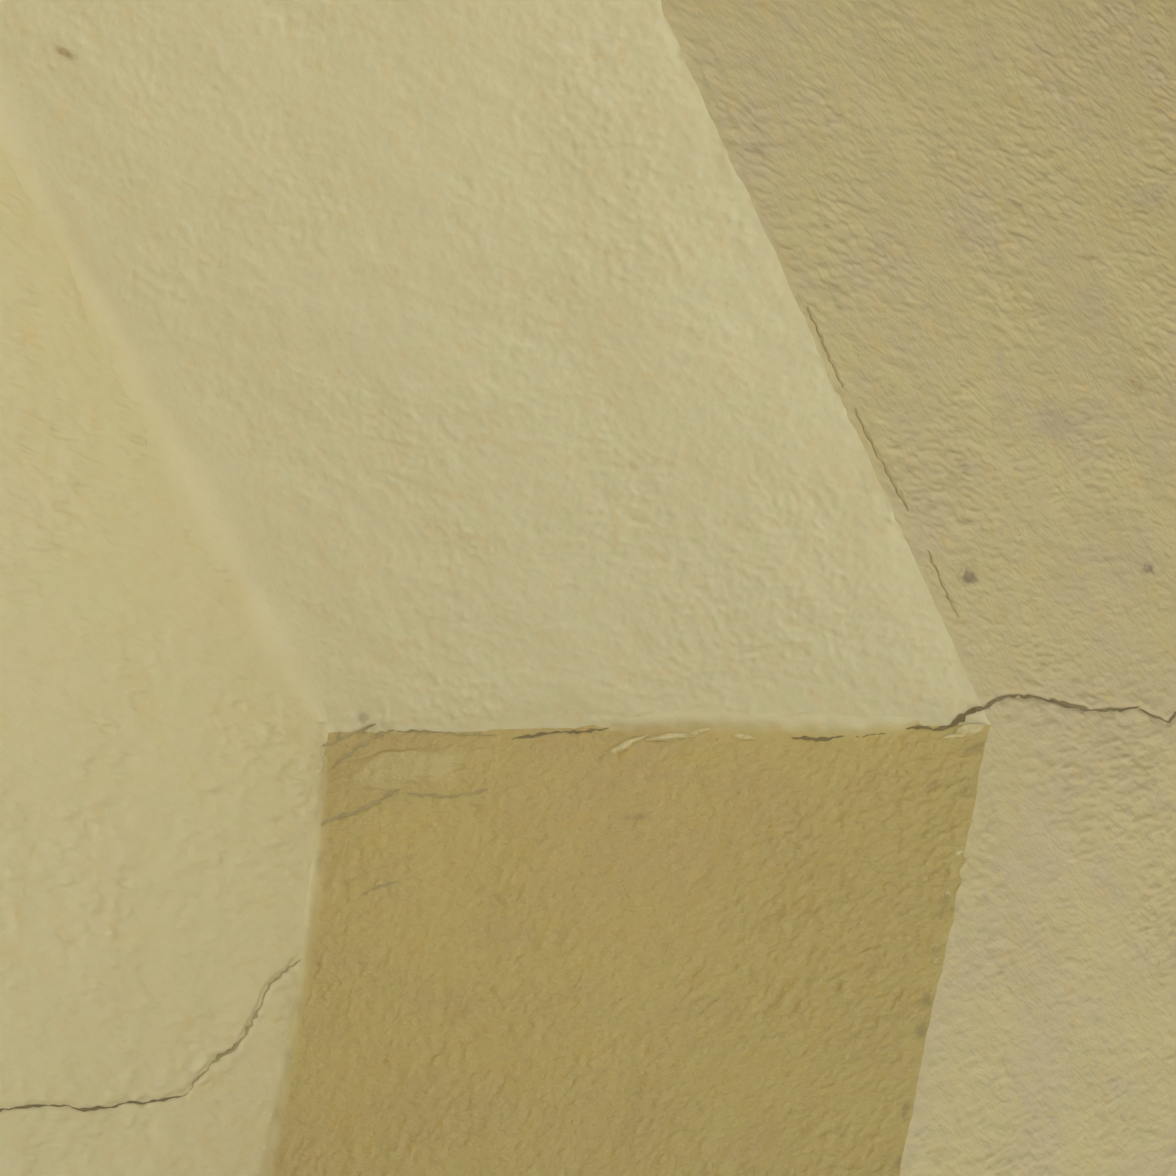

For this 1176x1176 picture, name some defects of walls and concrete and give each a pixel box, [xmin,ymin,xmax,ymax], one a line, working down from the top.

crack [792,694,1176,741]
crack [323,724,609,769]
crack [0,960,300,1112]